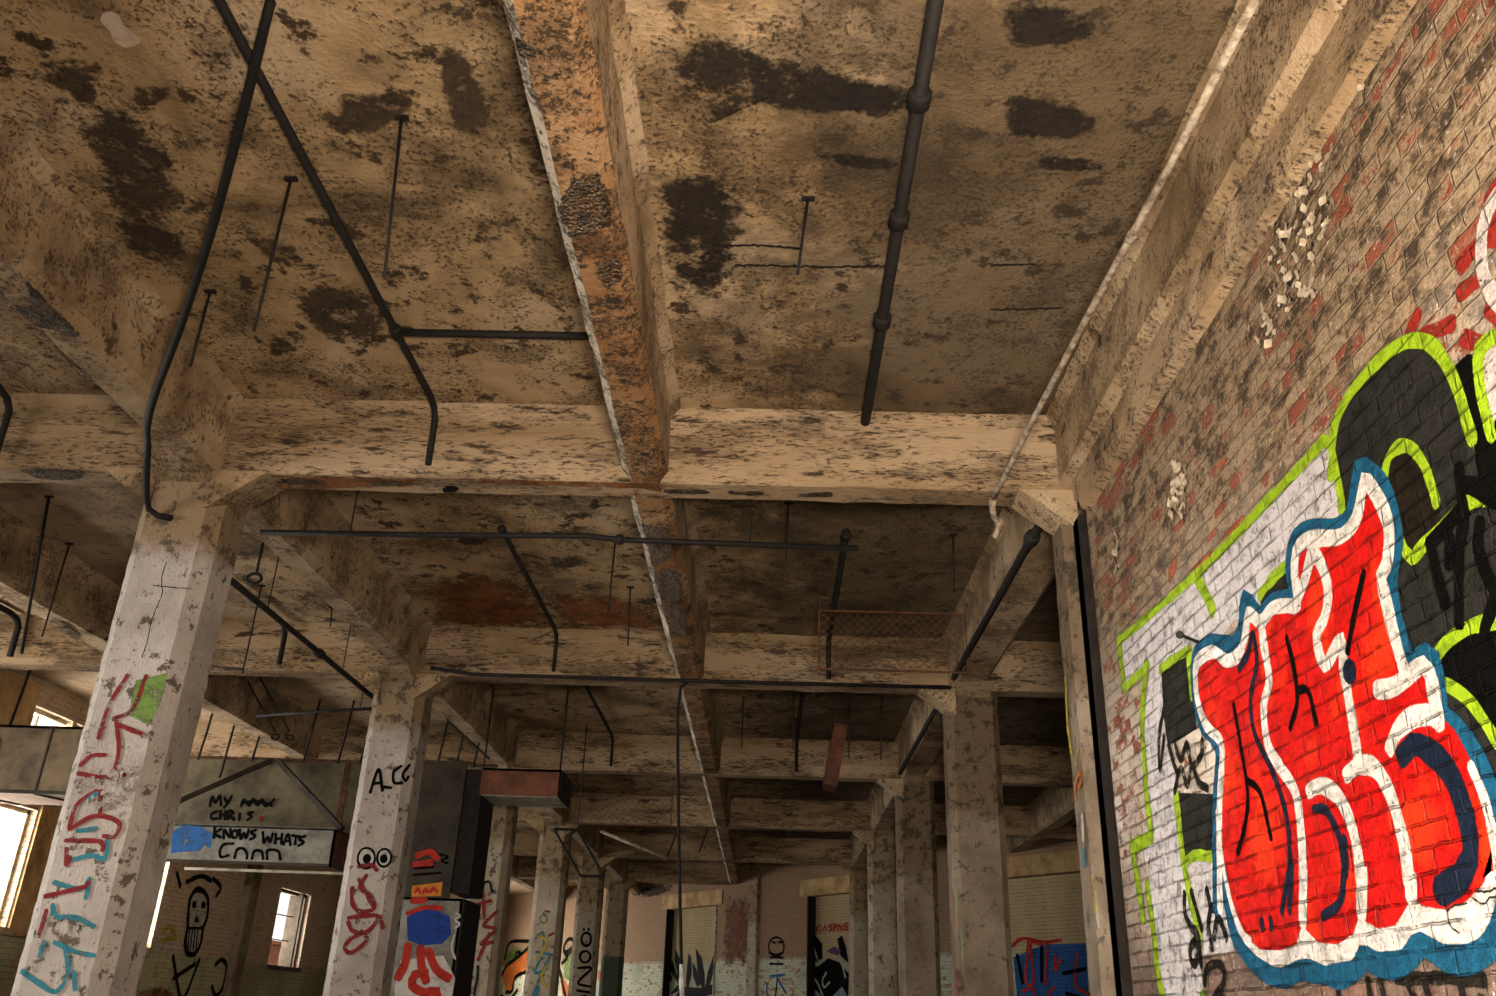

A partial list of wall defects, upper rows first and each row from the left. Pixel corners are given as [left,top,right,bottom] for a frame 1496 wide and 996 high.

leakage [1004,6,1099,47]
leakage [676,35,909,123]
leakage [1004,95,1095,140]
leakage [41,58,187,262]
leakage [819,154,896,169]
leakage [1038,157,1102,172]
spalling [558,172,612,241]
leakage [661,175,745,295]
peeling [1247,137,1333,348]
leakage [298,285,385,347]